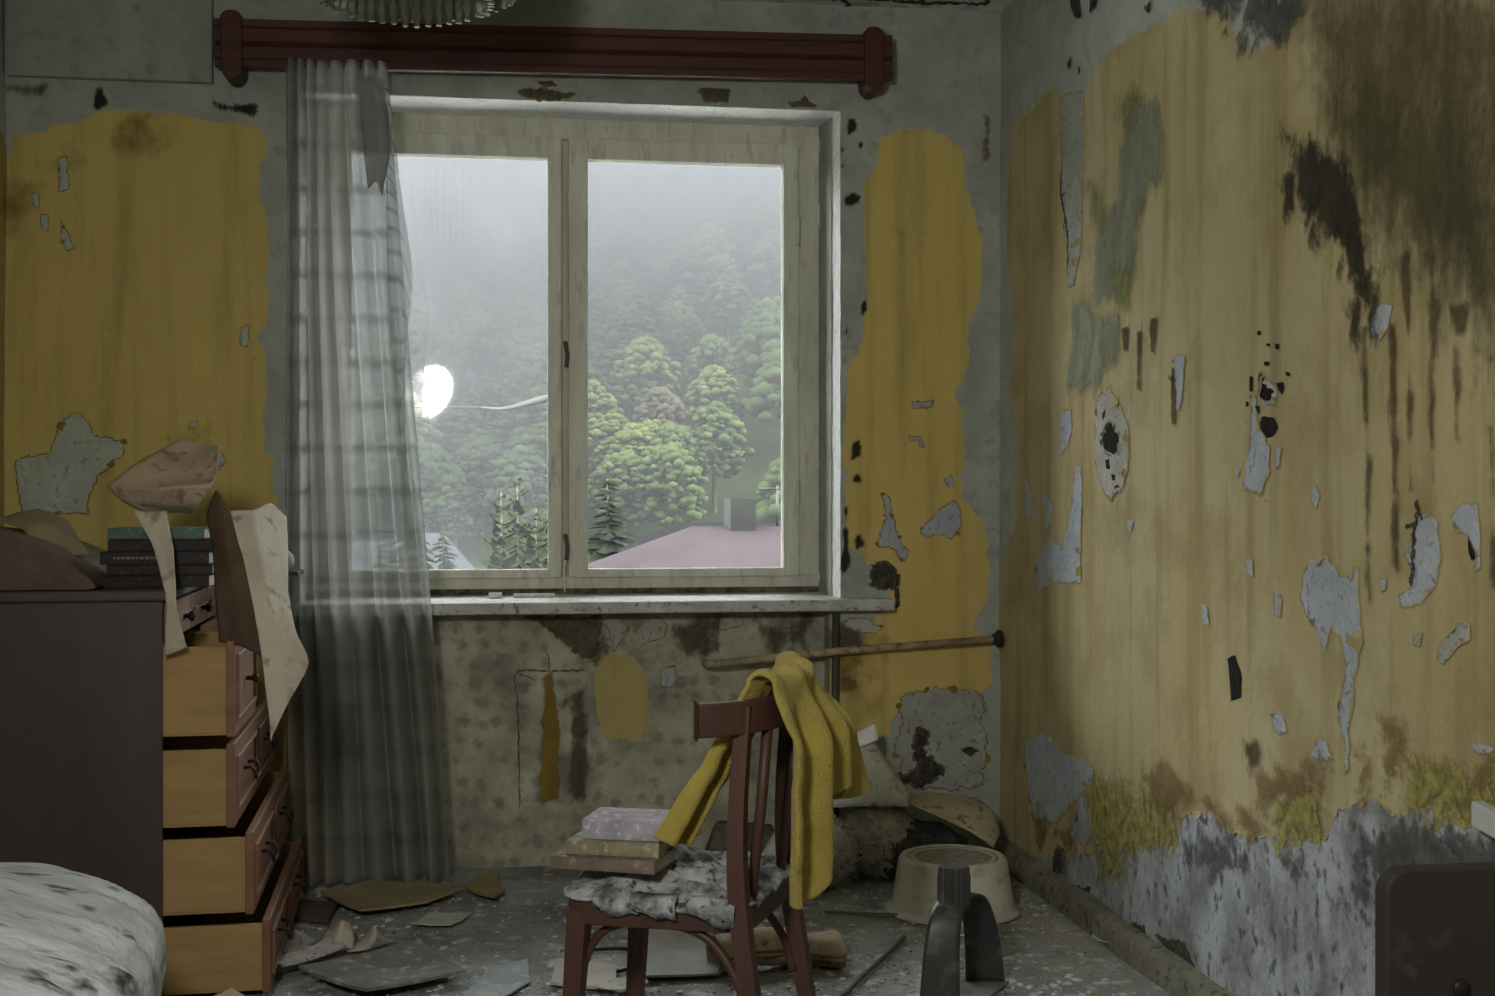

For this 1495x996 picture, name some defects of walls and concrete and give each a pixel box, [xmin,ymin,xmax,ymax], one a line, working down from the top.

water stain [1201,0,1495,570]
peeling [1169,354,1185,411]
peeling [869,492,909,608]
peeling [920,475,962,540]
peeling [1024,385,1130,592]
peeling [1380,502,1481,609]
peeling [1300,555,1364,774]
water stain [1244,740,1258,766]
water stain [1183,830,1249,884]
flaking render [1022,730,1494,996]
water stain [1340,817,1495,909]